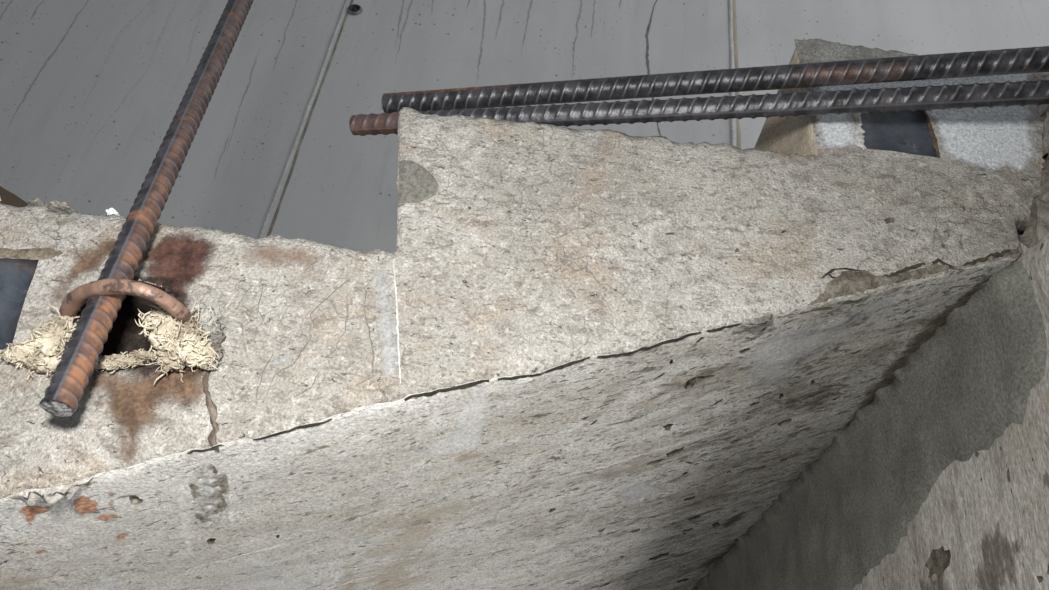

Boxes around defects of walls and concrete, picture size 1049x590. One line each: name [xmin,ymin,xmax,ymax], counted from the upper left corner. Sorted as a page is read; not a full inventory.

crack [645,0,661,136]
rust [70,240,115,278]
rust [144,235,213,307]
rust [93,365,202,460]
crack [187,276,375,454]